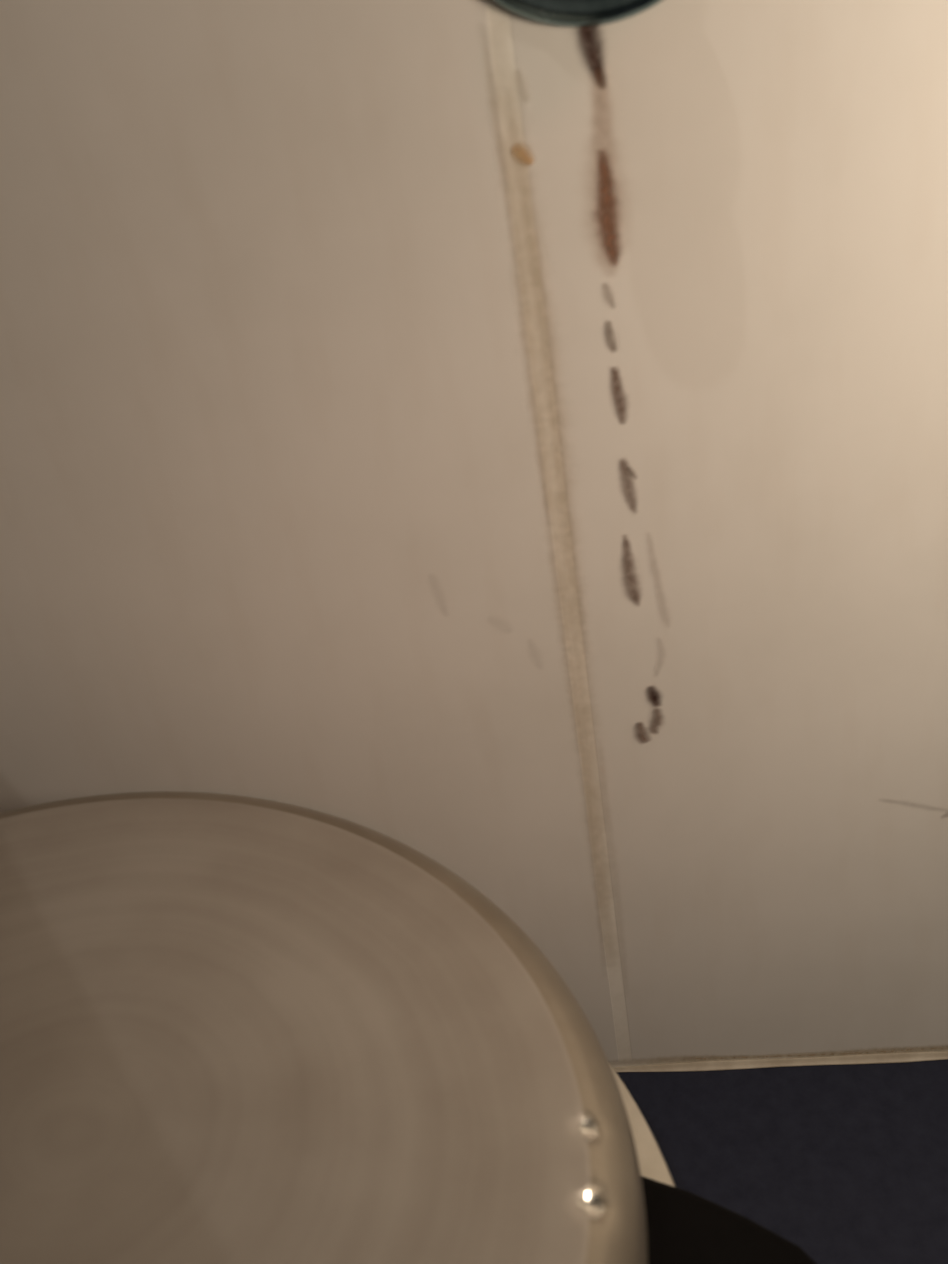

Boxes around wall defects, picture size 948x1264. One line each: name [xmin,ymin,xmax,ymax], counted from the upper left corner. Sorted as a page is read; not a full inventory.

corrosion [579,26,605,87]
corrosion [599,155,618,263]
corrosion [612,369,625,421]
corrosion [624,540,639,602]
corrosion [637,687,661,742]